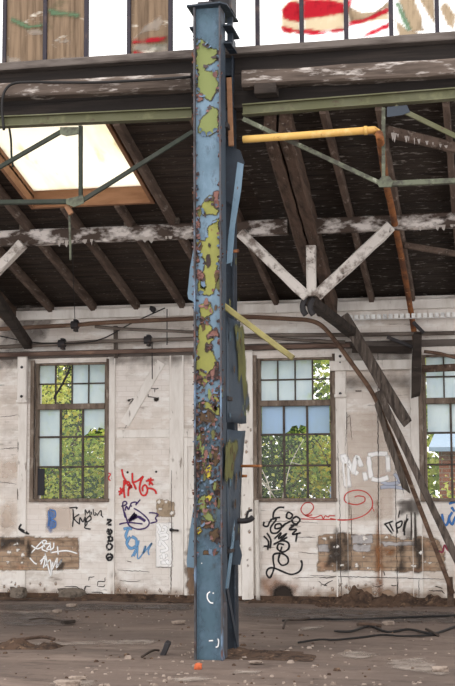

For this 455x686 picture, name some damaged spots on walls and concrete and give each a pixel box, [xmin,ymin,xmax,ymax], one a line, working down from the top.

peeling [191,38,222,157]
rust [375,130,389,177]
rust [384,187,417,341]
peeling [184,172,250,565]
damp [398,510,417,540]
flaking render [0,536,79,571]
flaking render [317,532,447,573]